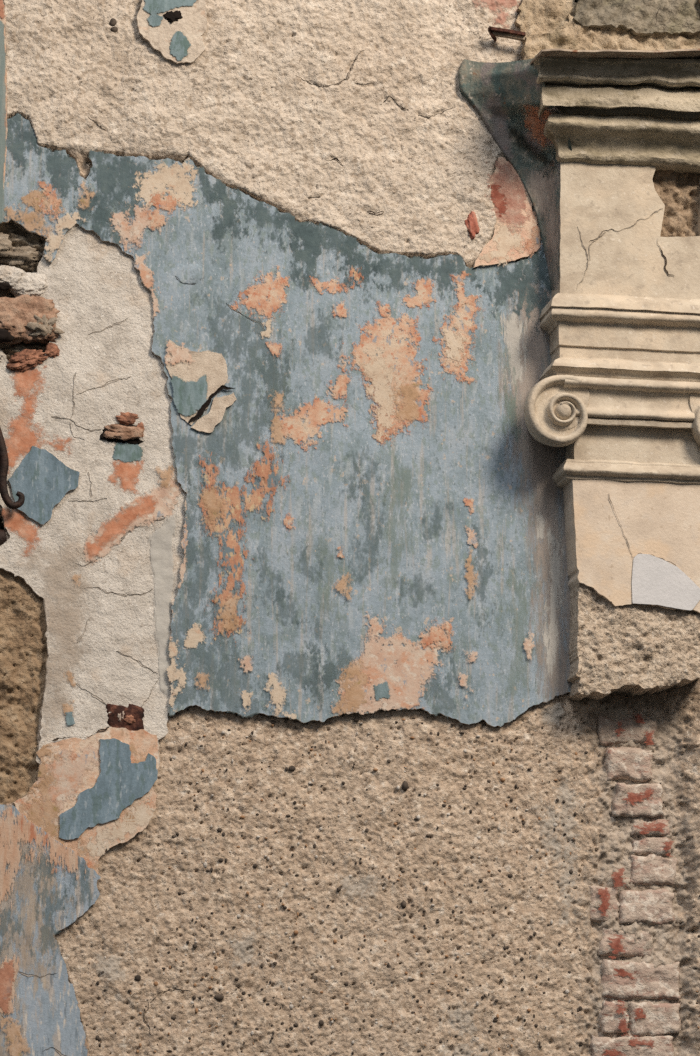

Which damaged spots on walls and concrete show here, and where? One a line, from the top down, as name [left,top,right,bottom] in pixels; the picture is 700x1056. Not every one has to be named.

spalling [652,170,700,237]
crack [577,208,662,284]
peeling [555,446,566,468]
peeling [0,0,560,1056]
peeling [550,487,572,694]
peeling [632,554,700,610]